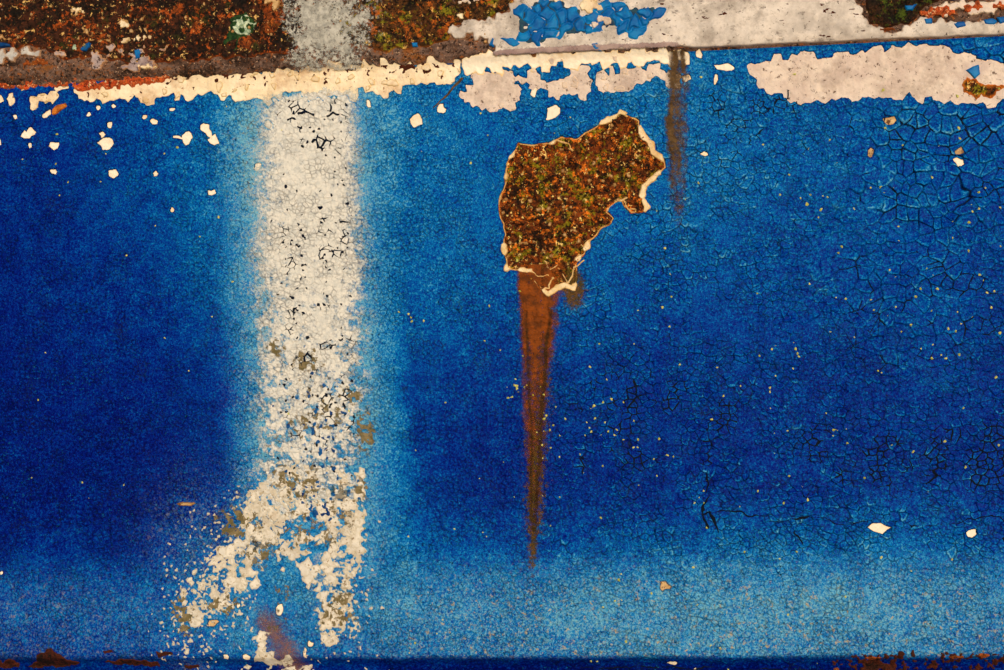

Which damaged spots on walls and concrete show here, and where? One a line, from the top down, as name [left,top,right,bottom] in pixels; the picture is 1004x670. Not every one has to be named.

corrosion [0,0,307,90]
peeling [0,0,1004,124]
peeling [98,122,114,150]
peeling [173,123,219,145]
crack [270,97,357,476]
corrosion [498,50,689,569]
crack [830,104,1004,381]
peeling [180,391,367,670]
crack [567,355,691,497]
crack [699,380,1004,546]
corrosion [0,648,80,669]
corrosion [832,650,1004,670]